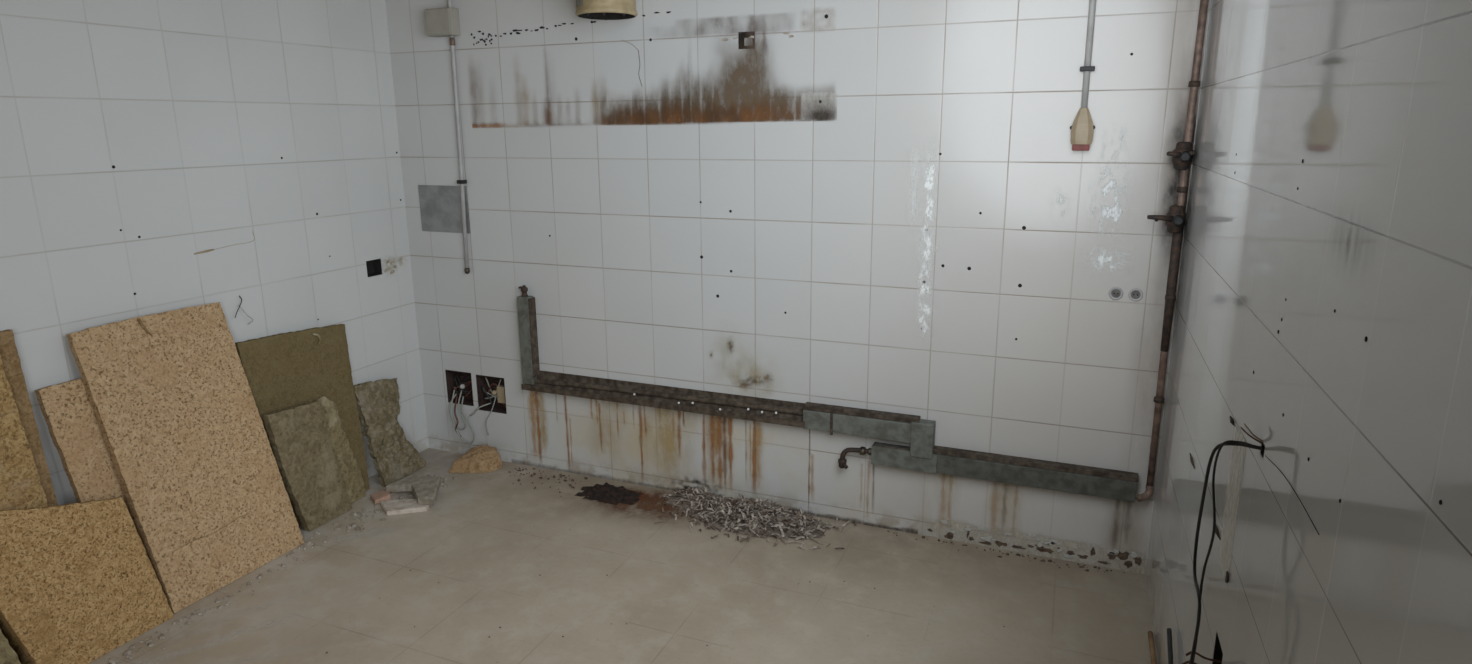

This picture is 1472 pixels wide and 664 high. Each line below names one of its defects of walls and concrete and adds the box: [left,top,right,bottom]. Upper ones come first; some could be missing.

rust [603,101,766,124]
rust [703,415,732,477]
rust [750,421,760,484]